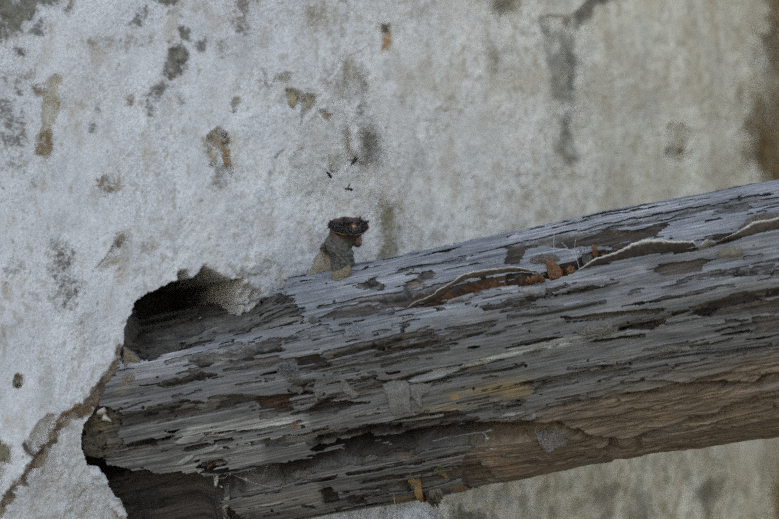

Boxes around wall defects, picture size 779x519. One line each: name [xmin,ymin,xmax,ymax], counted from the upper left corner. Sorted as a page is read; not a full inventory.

flaking render [32,74,62,158]
flaking render [202,129,230,167]
flaking render [0,442,11,463]
flaking render [22,415,55,458]
crack [0,343,123,515]
flaking render [97,407,112,422]
peeling [5,431,123,519]